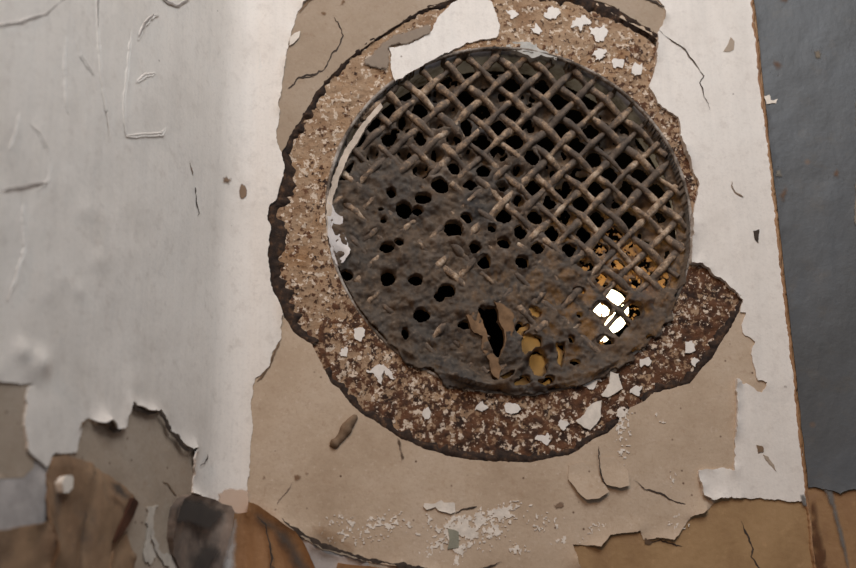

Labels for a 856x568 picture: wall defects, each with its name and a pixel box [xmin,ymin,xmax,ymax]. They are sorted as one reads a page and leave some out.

crack [289,19,344,89]
peeling [276,0,519,152]
rust [539,0,658,43]
peeling [571,15,643,76]
peeling [594,0,665,34]
crack [659,30,709,105]
peeling [326,103,383,267]
rust [267,0,457,344]
rust [639,291,742,402]
peeling [0,306,813,568]
crack [640,485,685,504]
crack [741,521,760,568]